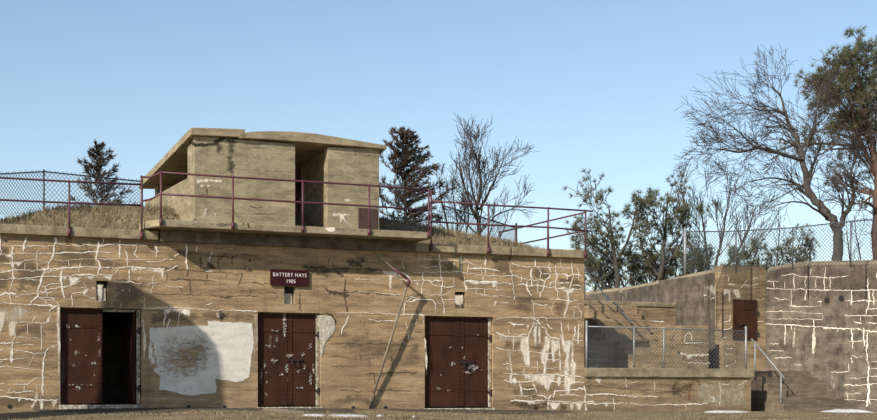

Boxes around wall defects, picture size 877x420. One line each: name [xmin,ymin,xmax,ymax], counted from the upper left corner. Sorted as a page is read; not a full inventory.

water stain [0,248,40,290]
water stain [57,246,164,306]
water stain [469,256,511,287]
water stain [535,270,580,317]
water stain [0,307,51,336]
peeling [142,319,153,363]
water stain [152,308,253,324]
water stain [500,325,608,410]
water stain [0,390,60,409]